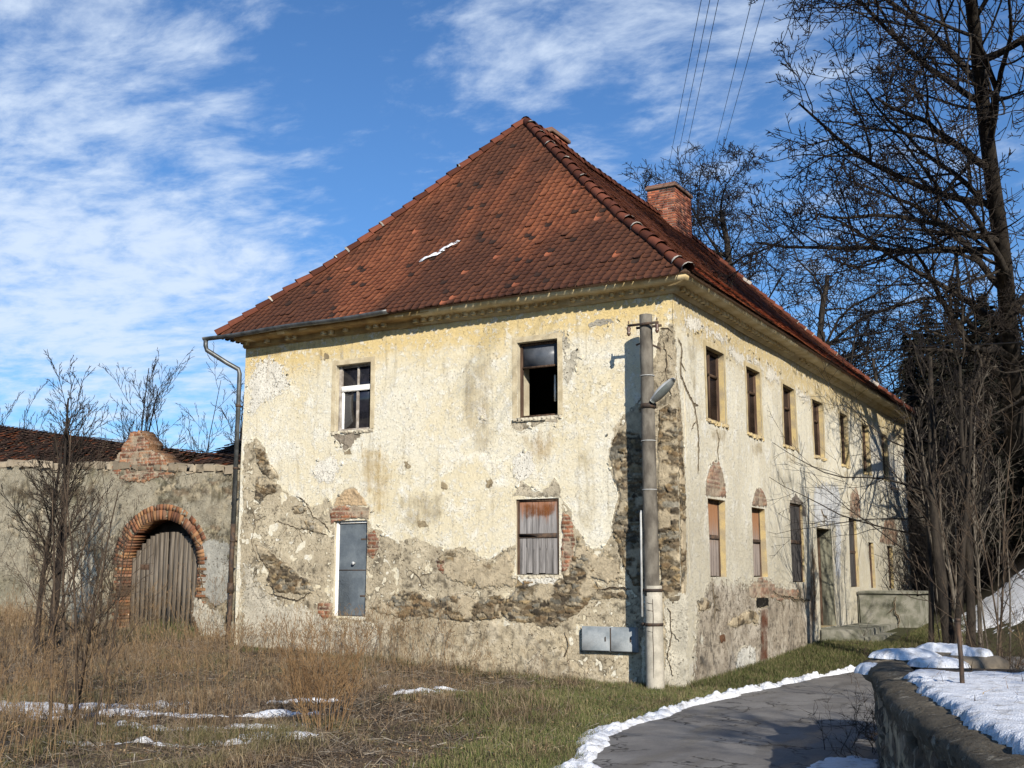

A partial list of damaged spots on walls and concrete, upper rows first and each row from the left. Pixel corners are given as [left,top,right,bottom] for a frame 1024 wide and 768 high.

flaking render [198,398,646,684]
crack [660,327,720,471]
spalling [653,314,817,682]